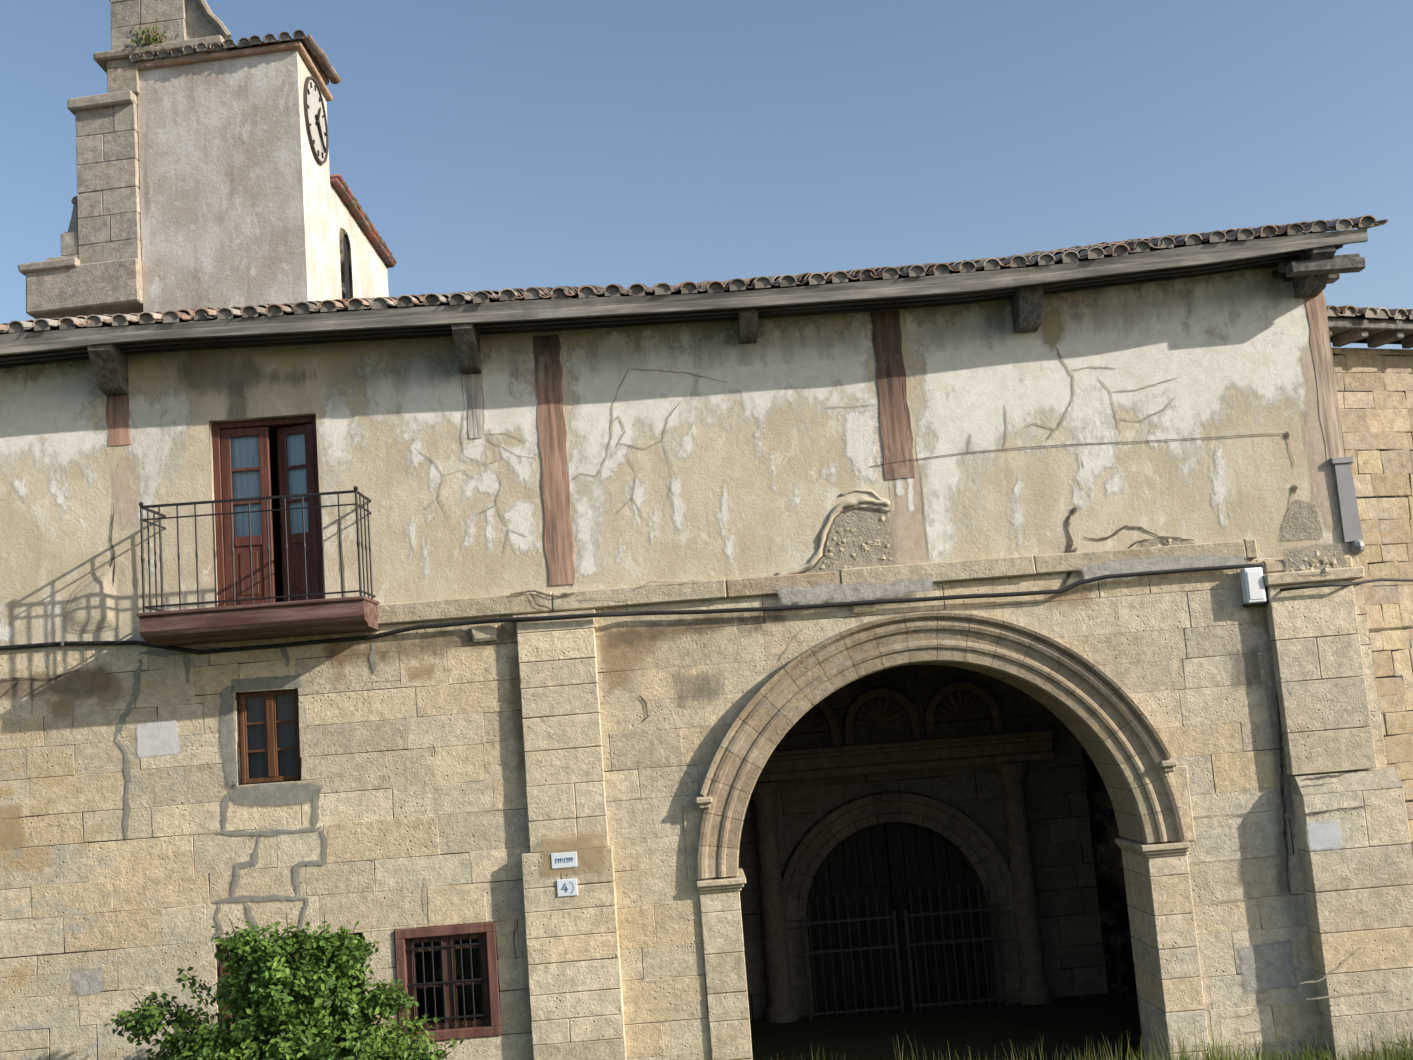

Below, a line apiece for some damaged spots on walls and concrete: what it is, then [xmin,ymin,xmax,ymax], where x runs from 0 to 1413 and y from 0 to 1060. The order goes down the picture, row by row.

peeling [0,360,198,526]
crack [416,373,533,556]
crack [573,369,724,522]
peeling [566,270,1346,578]
crack [968,339,1177,454]
peeling [0,607,31,645]
crack [510,584,576,610]
crack [1049,512,1194,589]